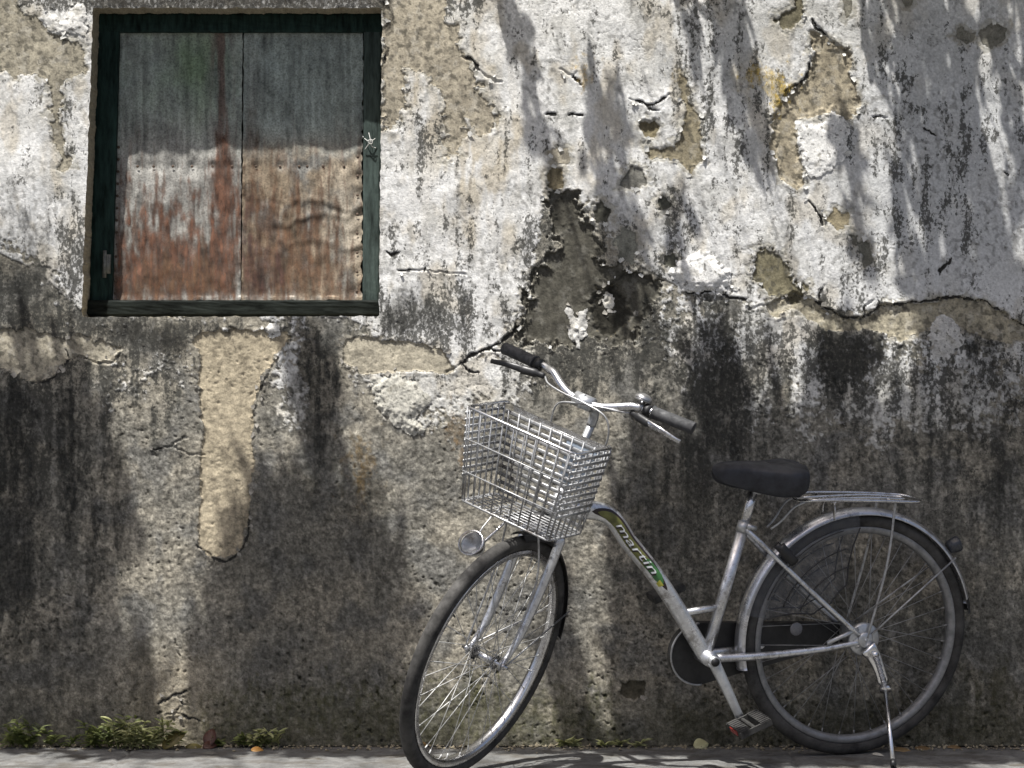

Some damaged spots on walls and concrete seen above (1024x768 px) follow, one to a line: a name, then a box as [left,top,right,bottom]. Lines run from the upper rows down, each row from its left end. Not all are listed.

peeling [638,75,707,178]
peeling [769,0,861,190]
water stain [0,373,47,639]
water stain [55,389,125,612]
corrosion [115,131,359,300]
peeling [193,327,294,557]
water stain [290,324,343,466]
crack [459,325,520,373]
spalling [514,147,664,350]
crack [686,289,748,305]
peeling [752,248,1024,344]
crack [815,288,1024,326]